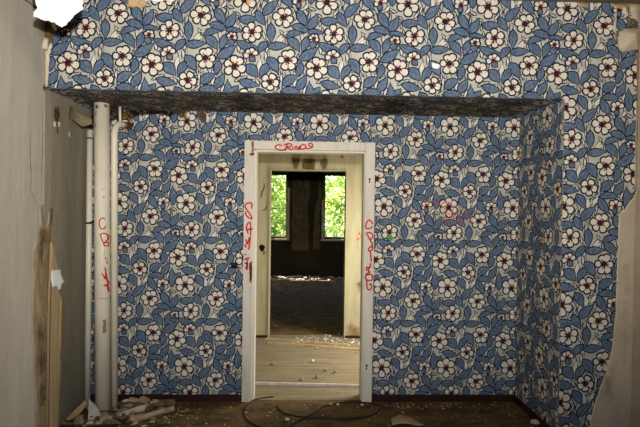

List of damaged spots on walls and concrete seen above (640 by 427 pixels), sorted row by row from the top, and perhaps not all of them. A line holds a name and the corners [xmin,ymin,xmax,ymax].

peeling [33,0,84,87]
peeling [31,205,64,427]
flaking render [591,190,635,427]